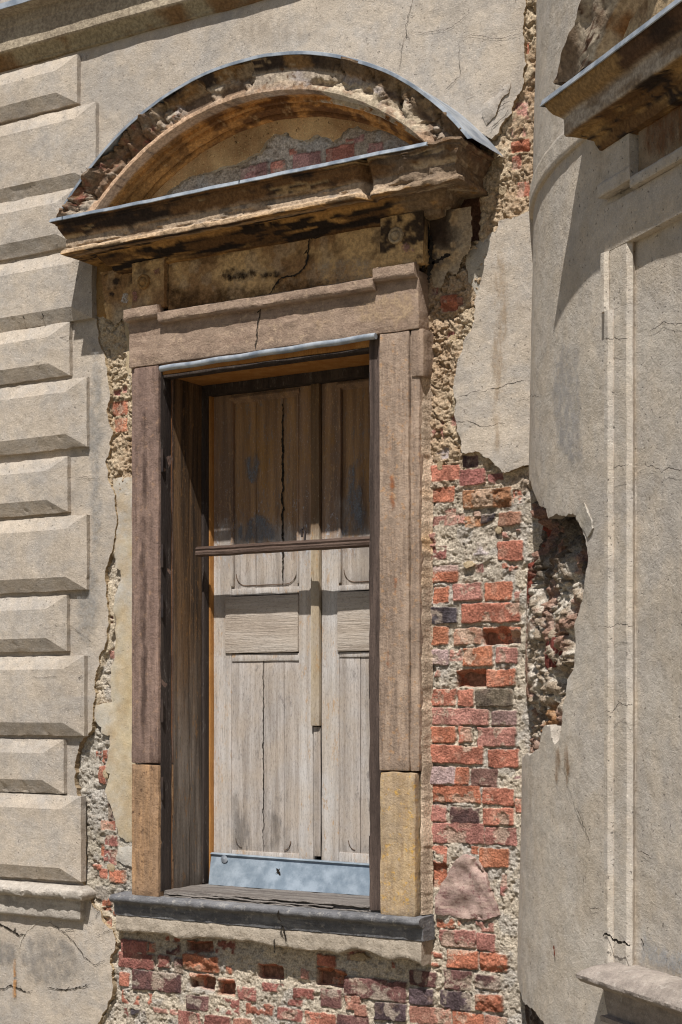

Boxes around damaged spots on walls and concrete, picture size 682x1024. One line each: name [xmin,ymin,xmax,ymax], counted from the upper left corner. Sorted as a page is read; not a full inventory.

crack [399,0,517,89]
crack [255,236,322,348]
spalling [77,0,594,1024]
crack [0,903,111,993]
crack [603,933,644,946]